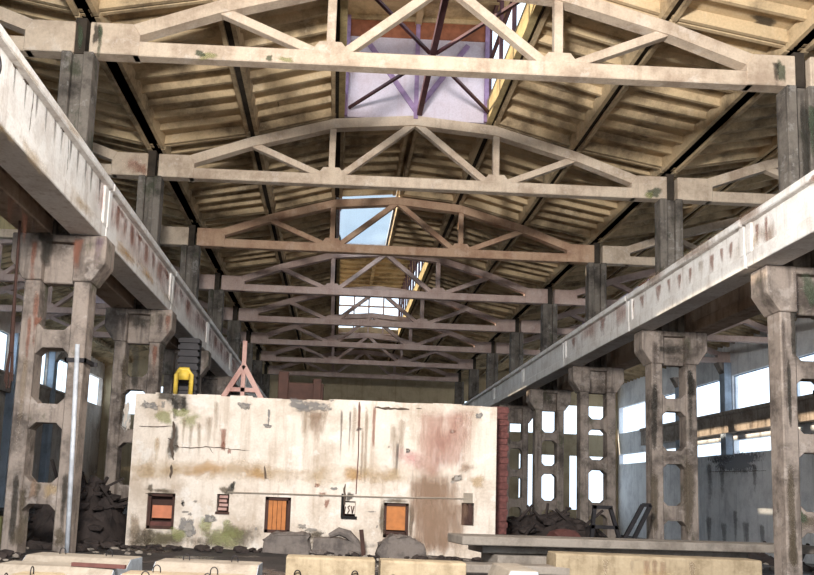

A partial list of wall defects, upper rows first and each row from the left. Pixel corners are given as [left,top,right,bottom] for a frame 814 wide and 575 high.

rust [117,207,190,308]
flaking render [290,398,334,412]
flaking render [179,500,197,537]
spalling [204,495,229,522]